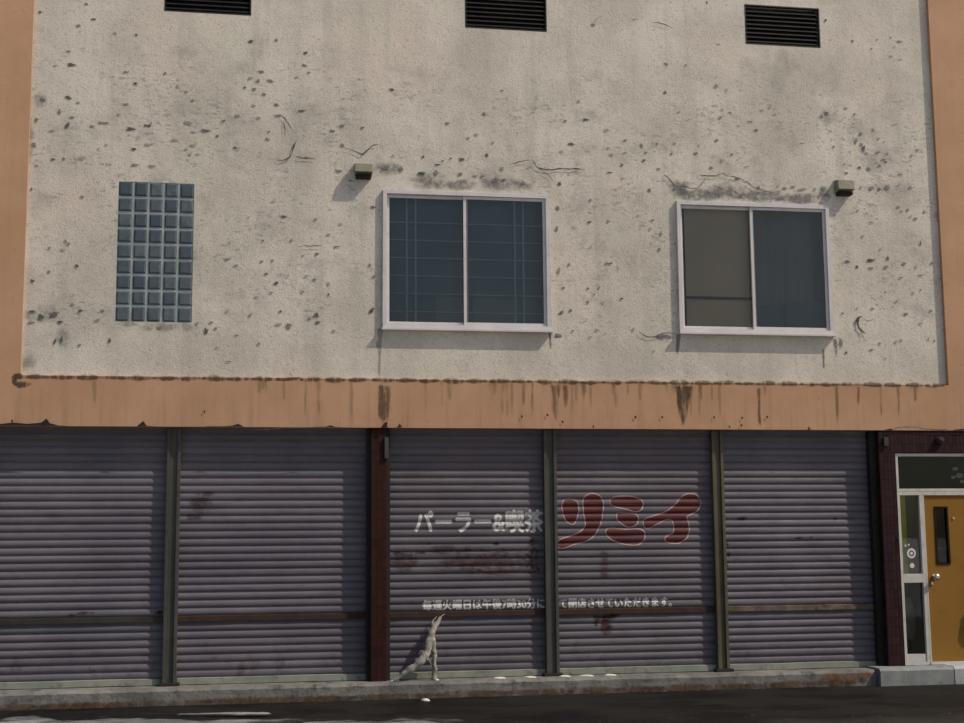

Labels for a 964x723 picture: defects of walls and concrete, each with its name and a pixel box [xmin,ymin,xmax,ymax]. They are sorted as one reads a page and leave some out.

crack [274,115,314,161]
crack [509,160,585,180]
leakage [419,177,465,189]
crack [664,173,774,193]
leakage [671,183,830,204]